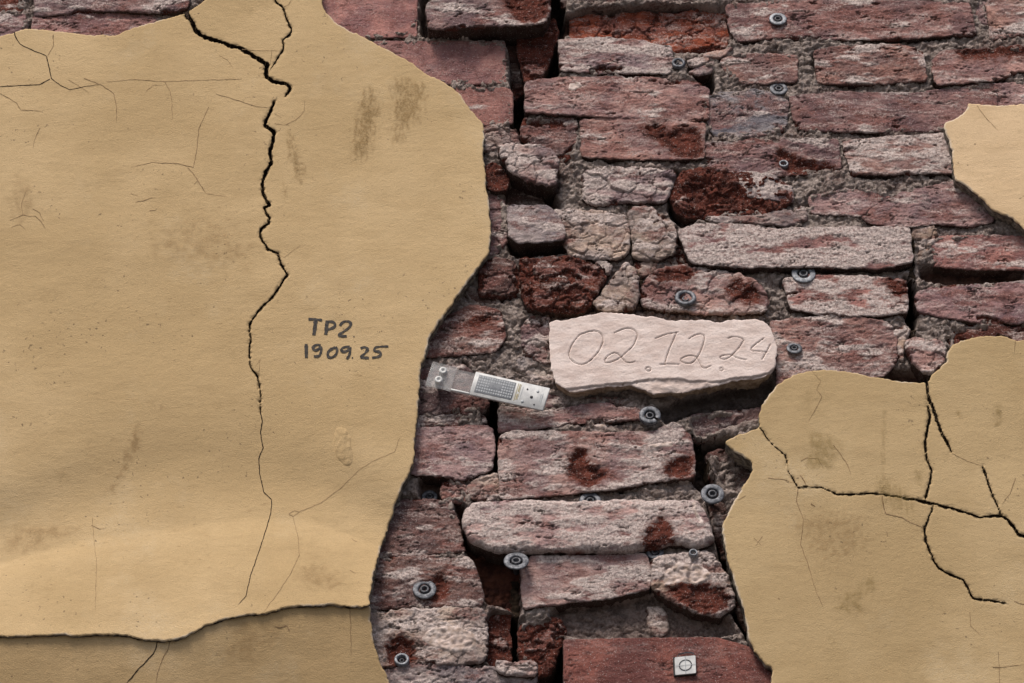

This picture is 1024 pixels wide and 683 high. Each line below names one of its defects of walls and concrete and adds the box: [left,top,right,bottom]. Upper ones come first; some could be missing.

peeling [687,47,733,87]
crack [0,0,400,645]
crack [759,377,1024,632]